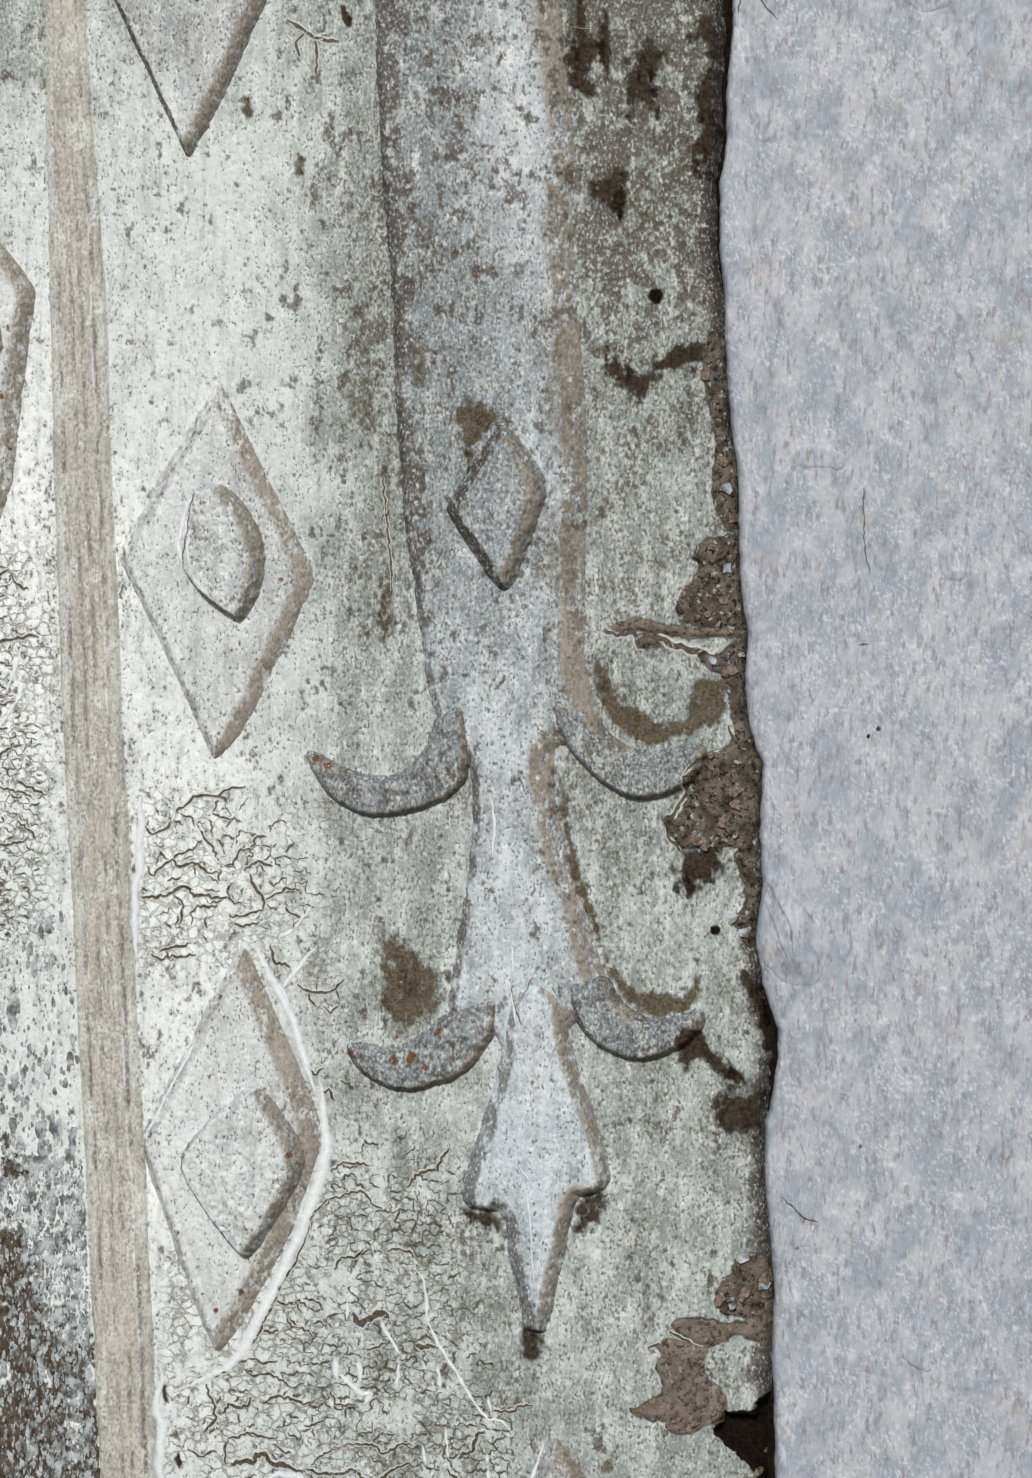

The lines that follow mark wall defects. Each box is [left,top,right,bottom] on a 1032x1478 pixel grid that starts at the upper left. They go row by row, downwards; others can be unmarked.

leakage [564,0,611,98]
leakage [693,95,723,165]
leakage [604,331,717,404]
crack [0,566,47,931]
spalling [611,334,763,947]
crack [141,786,344,1015]
crack [310,1068,353,1101]
crack [181,1132,534,1478]
spalling [629,1252,774,1478]